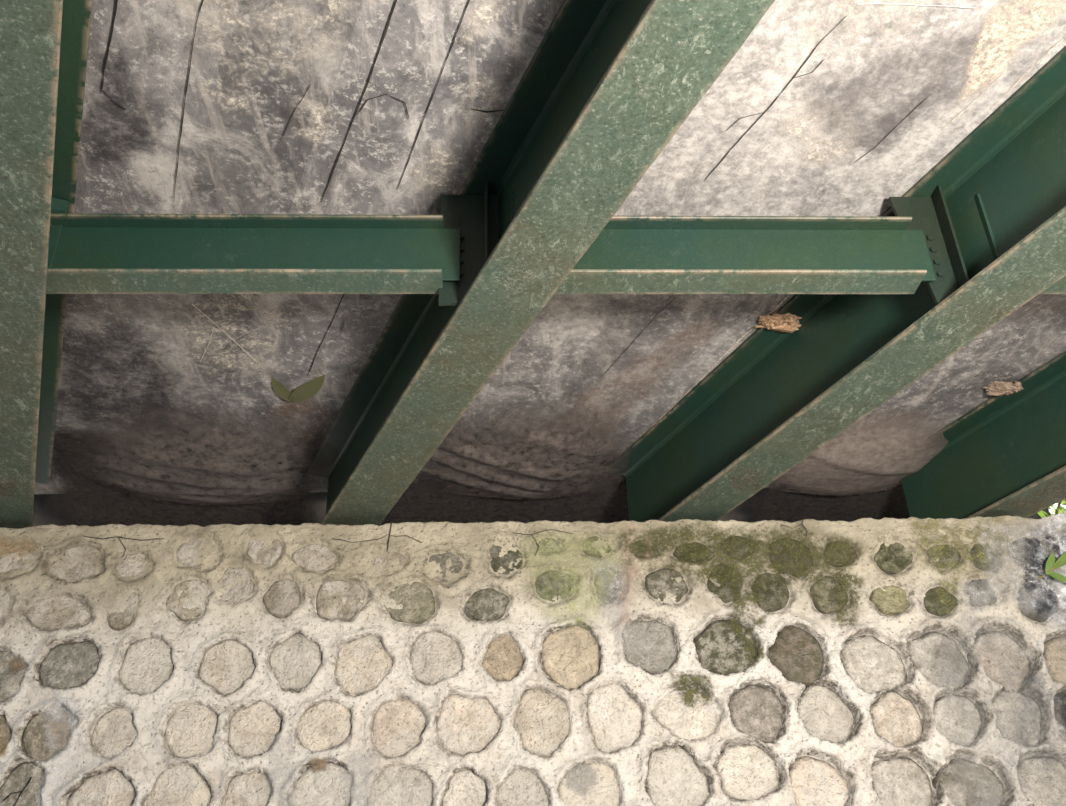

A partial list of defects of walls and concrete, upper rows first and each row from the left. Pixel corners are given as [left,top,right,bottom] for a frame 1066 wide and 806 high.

crack [100,0,126,110]
crack [174,0,204,199]
crack [321,0,470,202]
crack [705,22,840,180]
peeling [645,294,796,433]
peeling [986,381,1023,395]
water stain [730,589,765,632]
water stain [835,574,863,626]
crack [3,777,32,806]